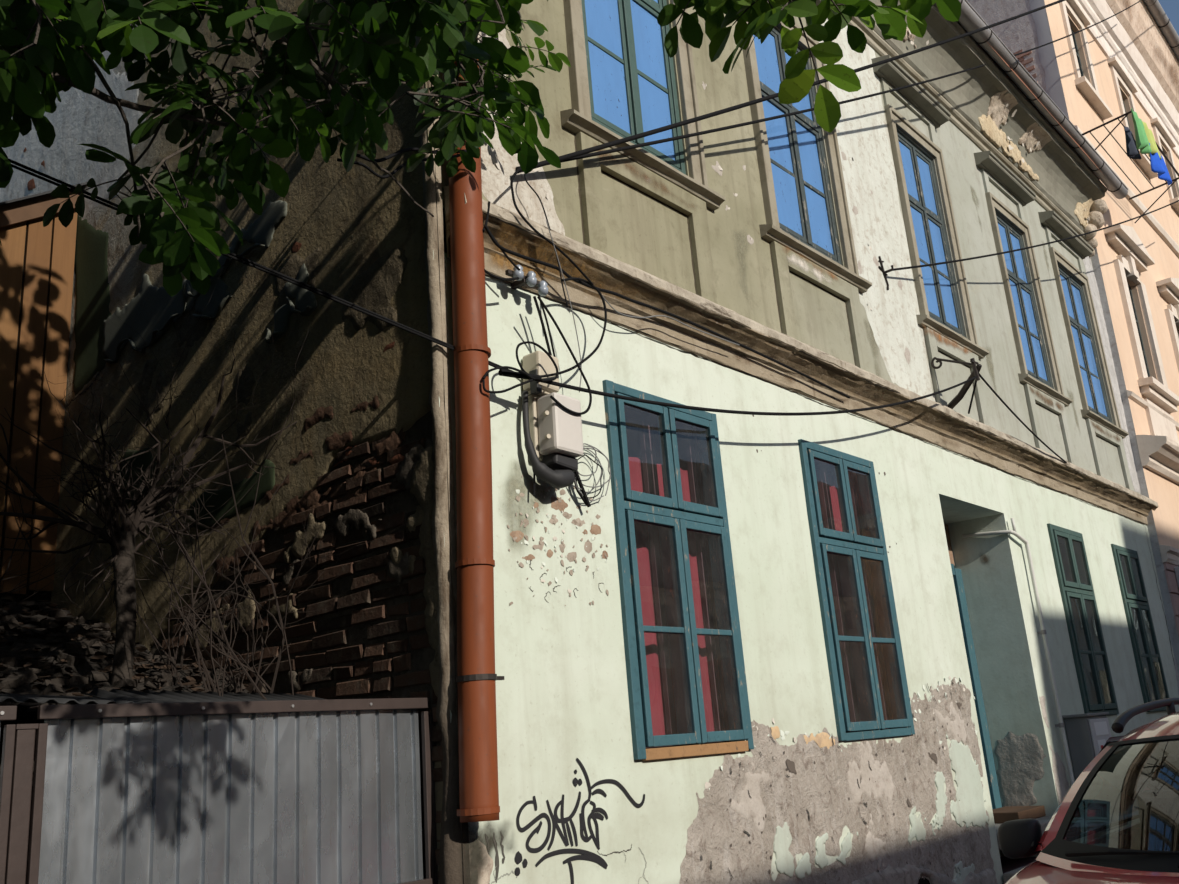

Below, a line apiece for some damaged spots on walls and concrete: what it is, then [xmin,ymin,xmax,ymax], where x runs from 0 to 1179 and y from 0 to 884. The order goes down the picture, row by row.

flaking render [978,90,1052,181]
peeling [103,200,287,364]
flaking render [265,248,322,345]
flaking render [161,406,443,782]
peeling [507,475,609,606]
flaking render [679,676,1070,884]